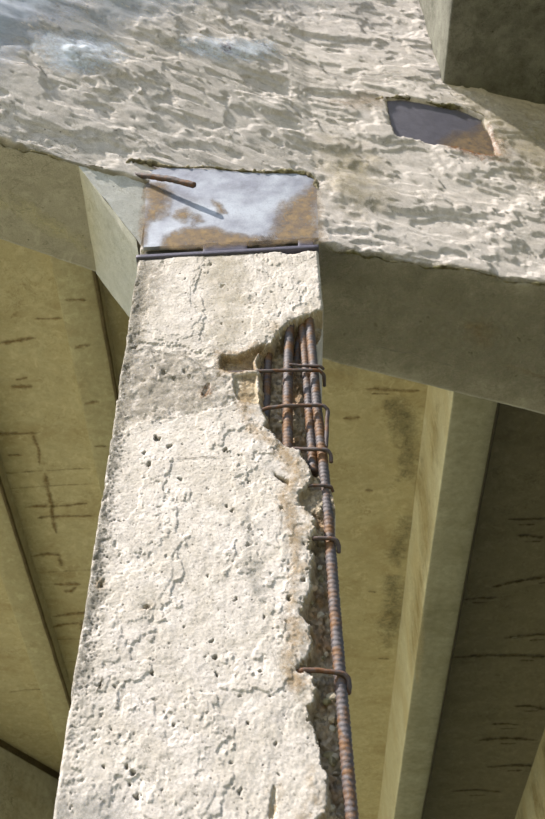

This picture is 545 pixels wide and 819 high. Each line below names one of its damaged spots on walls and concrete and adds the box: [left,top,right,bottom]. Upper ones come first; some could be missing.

spalling [426,101,487,119]
corrosion [139,183,322,248]
spalling [219,309,359,819]